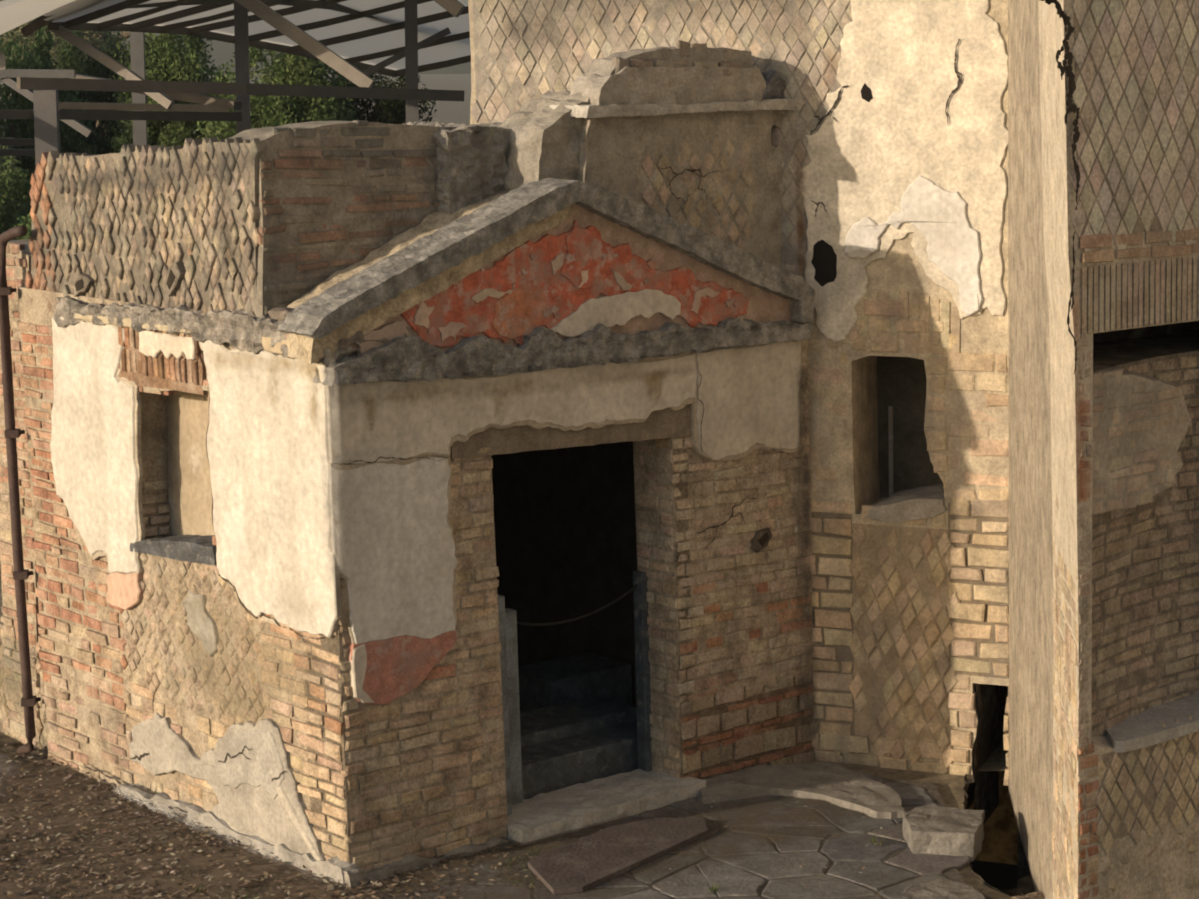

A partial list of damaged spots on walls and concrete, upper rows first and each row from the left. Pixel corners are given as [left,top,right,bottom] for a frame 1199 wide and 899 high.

crack [945,39,963,123]
flaking render [800,0,1008,342]
crack [1040,0,1080,373]
spalling [73,274,95,297]
flaking render [355,292,466,354]
flaking render [471,253,741,339]
flaking render [50,314,803,705]
flaking render [129,713,326,861]